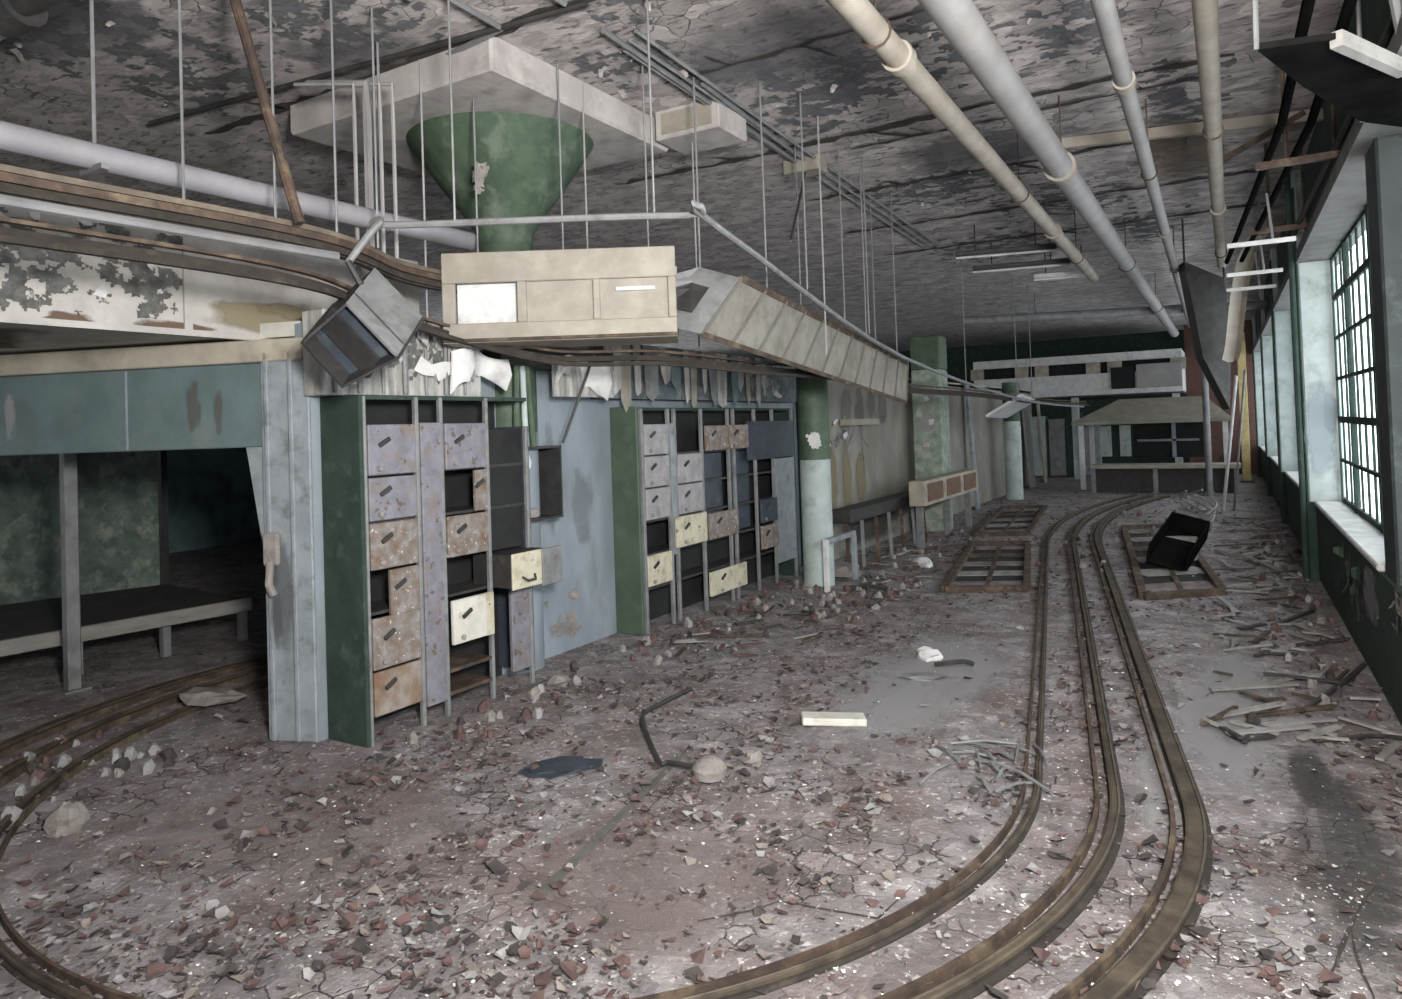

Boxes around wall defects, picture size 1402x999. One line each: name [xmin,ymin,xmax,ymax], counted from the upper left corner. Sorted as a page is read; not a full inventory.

peeling [569,0,698,98]
peeling [725,37,913,142]
peeling [894,5,972,89]
peeling [978,0,1106,78]
peeling [1116,0,1147,40]
crack [1031,53,1235,111]
peeling [1135,58,1203,127]
peeling [1220,58,1237,102]
crack [616,101,1006,185]
peeling [846,166,1080,267]
peeling [1085,180,1194,246]
peeling [0,207,182,319]